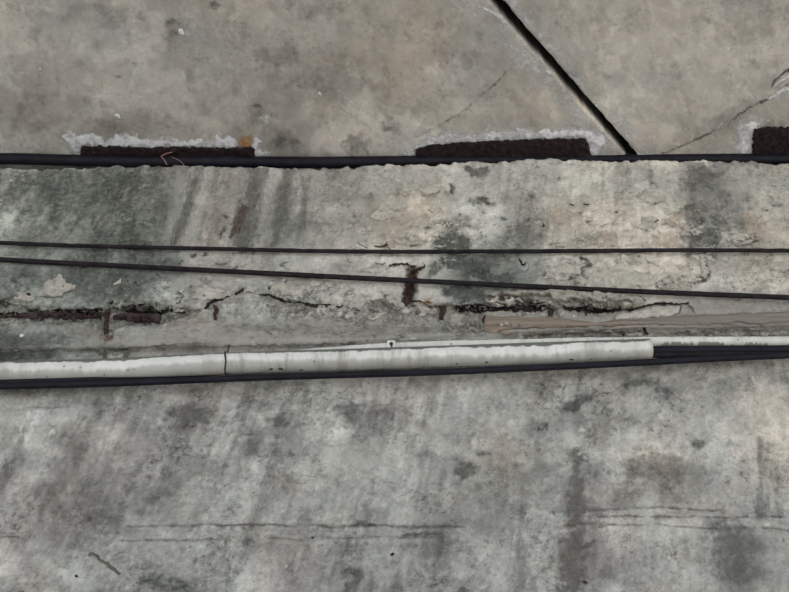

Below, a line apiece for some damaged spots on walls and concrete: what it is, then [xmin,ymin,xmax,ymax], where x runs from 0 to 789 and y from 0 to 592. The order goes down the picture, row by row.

water stain [509,0,612,117]
water stain [62,131,298,156]
water stain [403,88,609,156]
water stain [220,168,274,248]
water stain [429,222,511,304]
corrosion [0,308,161,324]
spalling [0,274,225,337]
crack [204,288,360,311]
spalling [266,267,634,334]
crack [634,296,694,314]
water stain [563,395,593,412]
water stain [556,449,595,592]